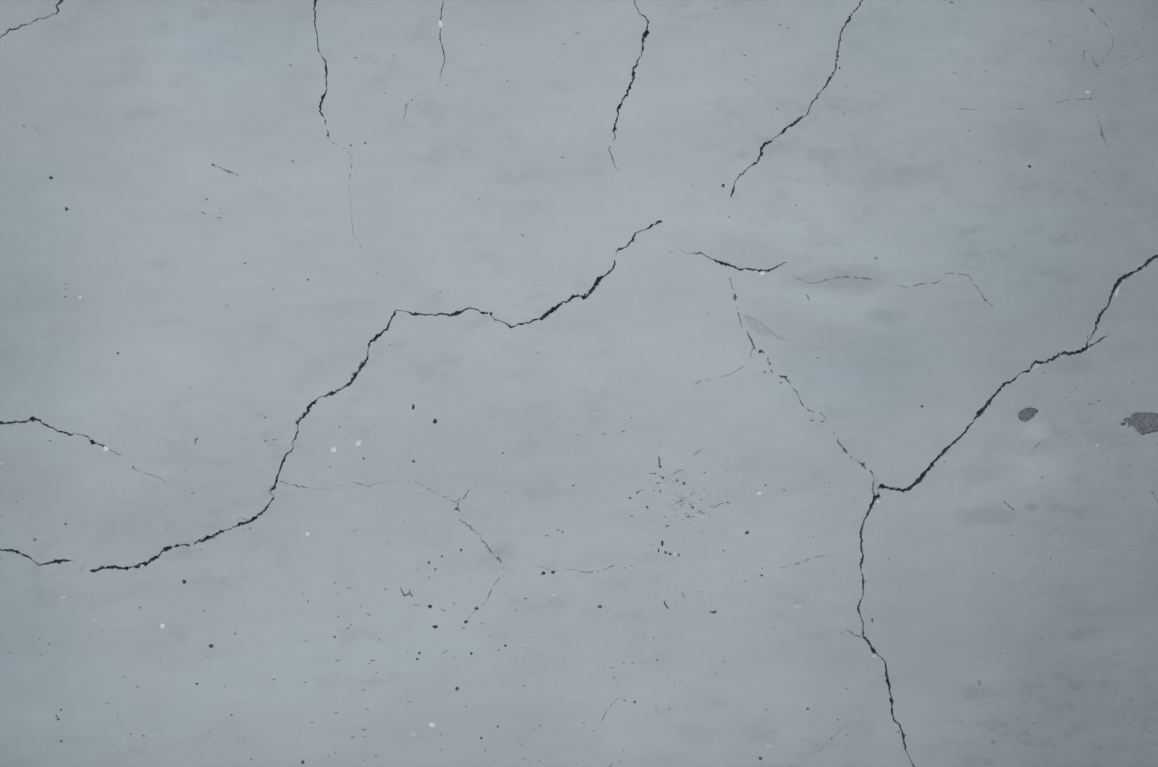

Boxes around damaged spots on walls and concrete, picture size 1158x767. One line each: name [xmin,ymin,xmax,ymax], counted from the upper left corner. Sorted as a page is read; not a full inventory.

crack [0,0,65,39]
crack [312,0,366,247]
crack [608,0,649,171]
crack [722,0,863,197]
crack [0,220,663,624]
crack [677,248,1158,767]